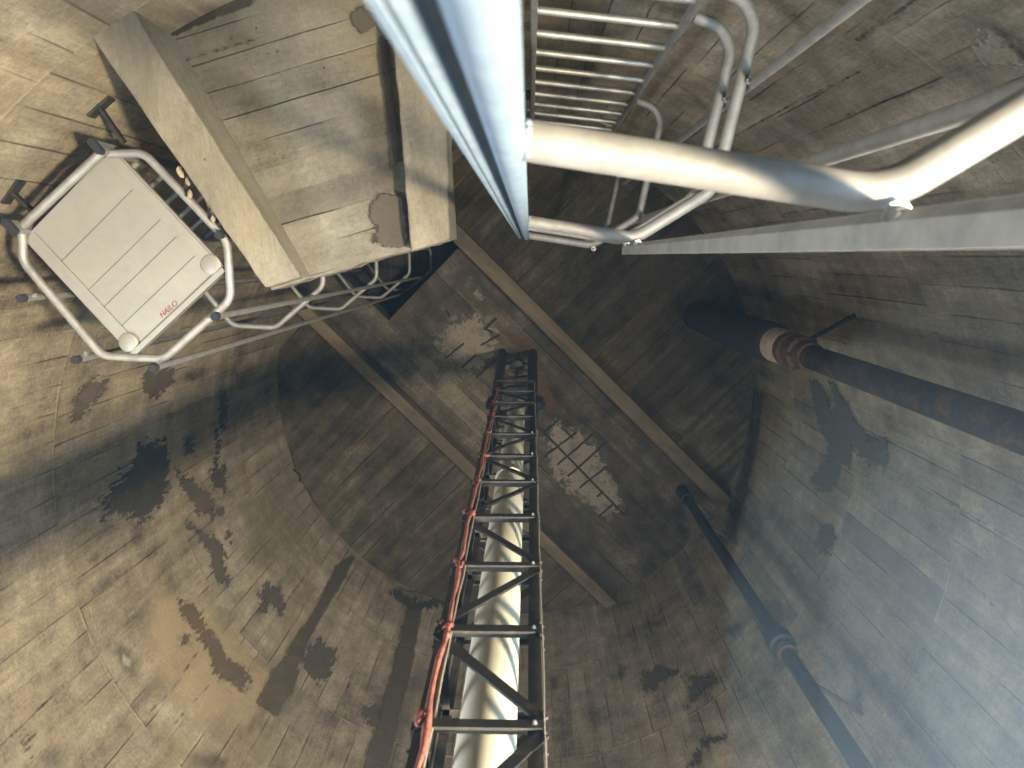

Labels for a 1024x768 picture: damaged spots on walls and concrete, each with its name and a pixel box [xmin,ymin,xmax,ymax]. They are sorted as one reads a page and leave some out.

spalling [370,193,408,248]
spalling [432,274,502,379]
leakage [98,436,170,540]
spalling [539,417,626,521]
leakage [808,376,889,498]
leakage [152,556,355,722]